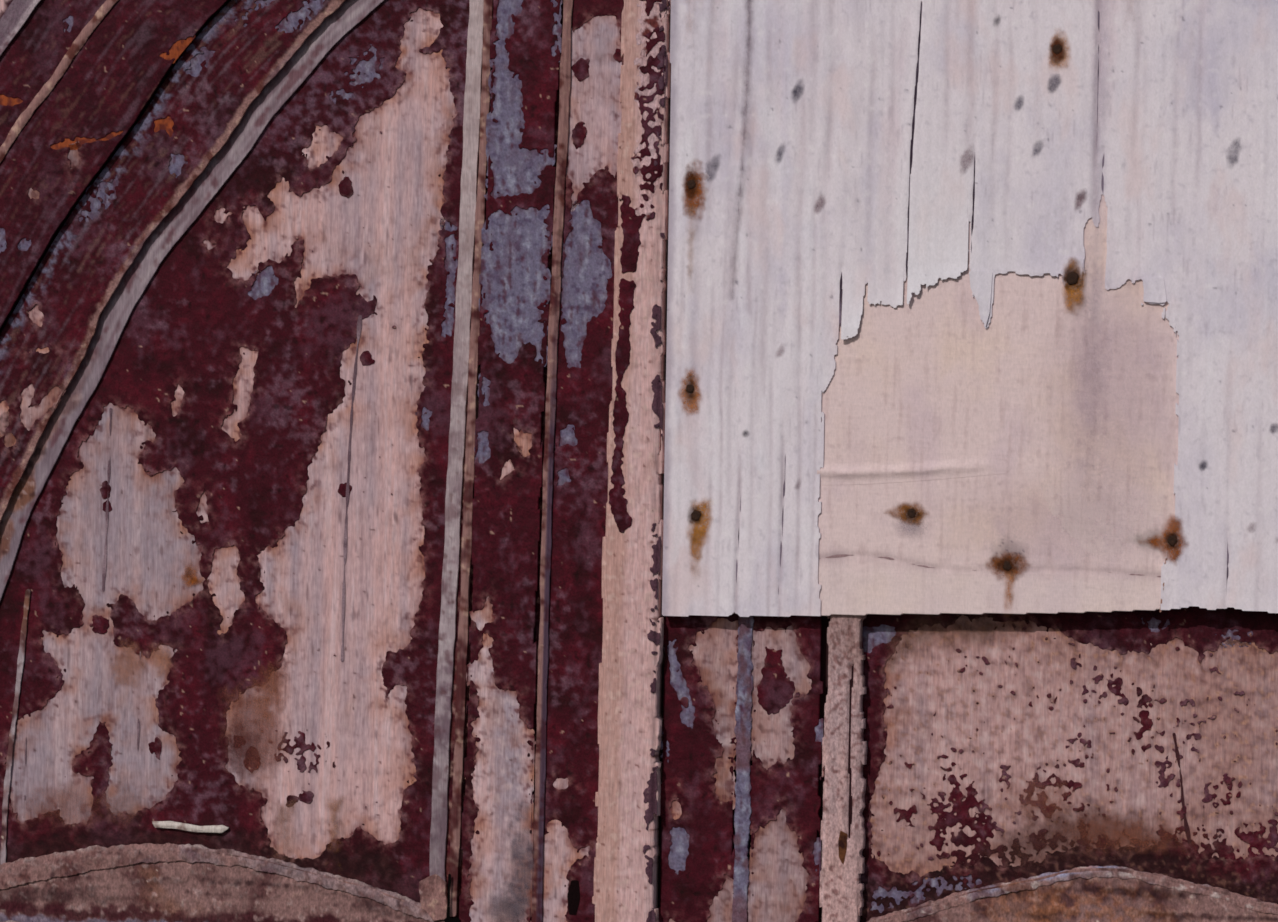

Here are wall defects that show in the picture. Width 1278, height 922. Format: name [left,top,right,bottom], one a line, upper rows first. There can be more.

peeling [0,8,458,859]
peeling [465,596,590,922]
peeling [477,0,670,533]
corrosion [681,372,700,413]
corrosion [684,172,704,215]
corrosion [690,502,710,554]
peeling [647,523,812,809]
peeling [707,809,821,922]
crack [906,1,922,277]
corrosion [1050,35,1068,66]
peeling [862,615,1278,913]
corrosion [1148,517,1185,561]